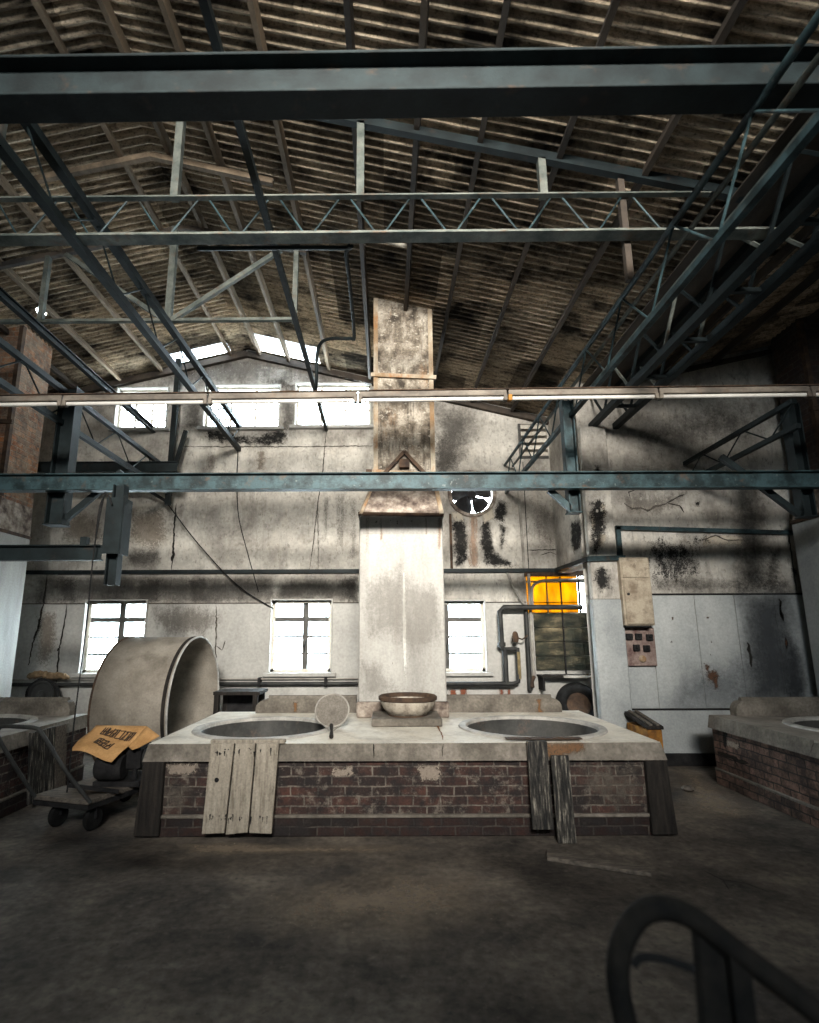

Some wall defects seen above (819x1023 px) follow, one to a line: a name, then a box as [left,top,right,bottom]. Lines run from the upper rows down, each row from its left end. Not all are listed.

mould [186,403,294,446]
crack [624,490,684,512]
mould [452,519,468,566]
mould [480,500,521,568]
mould [594,567,610,592]
leakage [649,536,709,588]
crack [28,577,67,683]
corrosion [705,641,719,690]